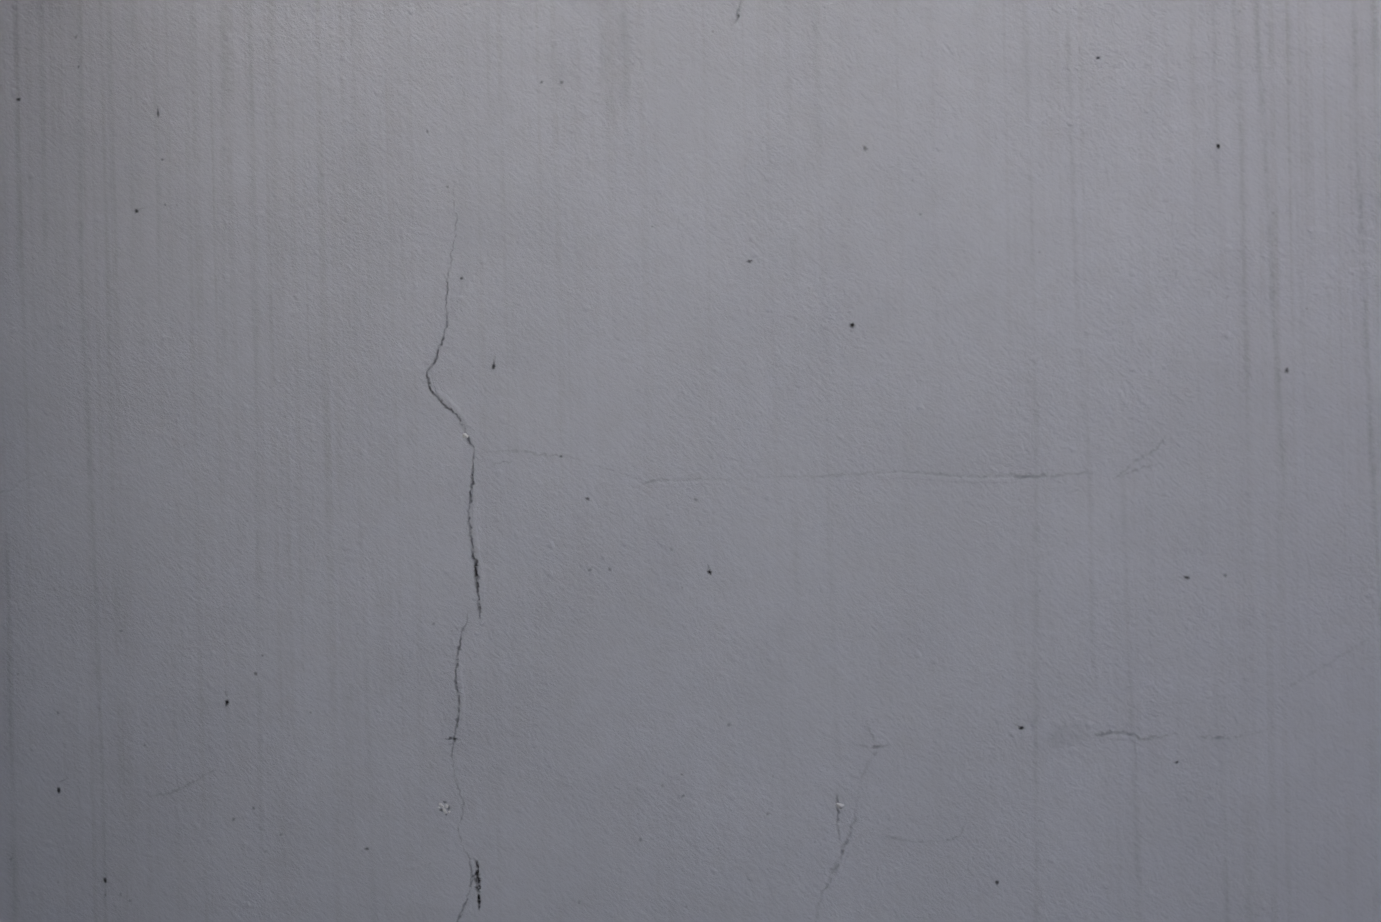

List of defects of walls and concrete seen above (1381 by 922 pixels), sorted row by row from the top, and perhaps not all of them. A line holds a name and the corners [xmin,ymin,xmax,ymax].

crack [426,338,485,609]
crack [438,646,466,746]
crack [469,862,481,908]